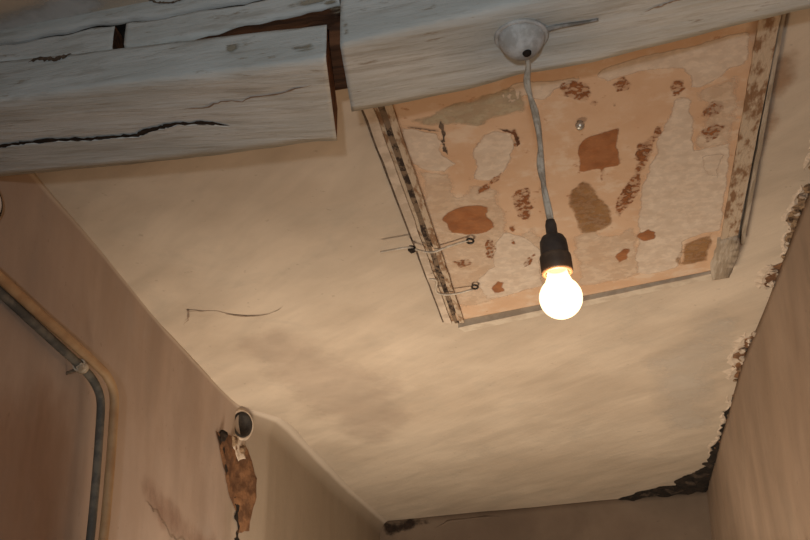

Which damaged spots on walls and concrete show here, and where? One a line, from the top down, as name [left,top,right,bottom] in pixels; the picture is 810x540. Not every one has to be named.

peeling [403,78,579,306]
peeling [575,33,749,285]
flaking render [754,184,810,290]
flaking render [722,331,756,382]
flaking render [618,394,733,501]
flaking render [384,519,416,535]